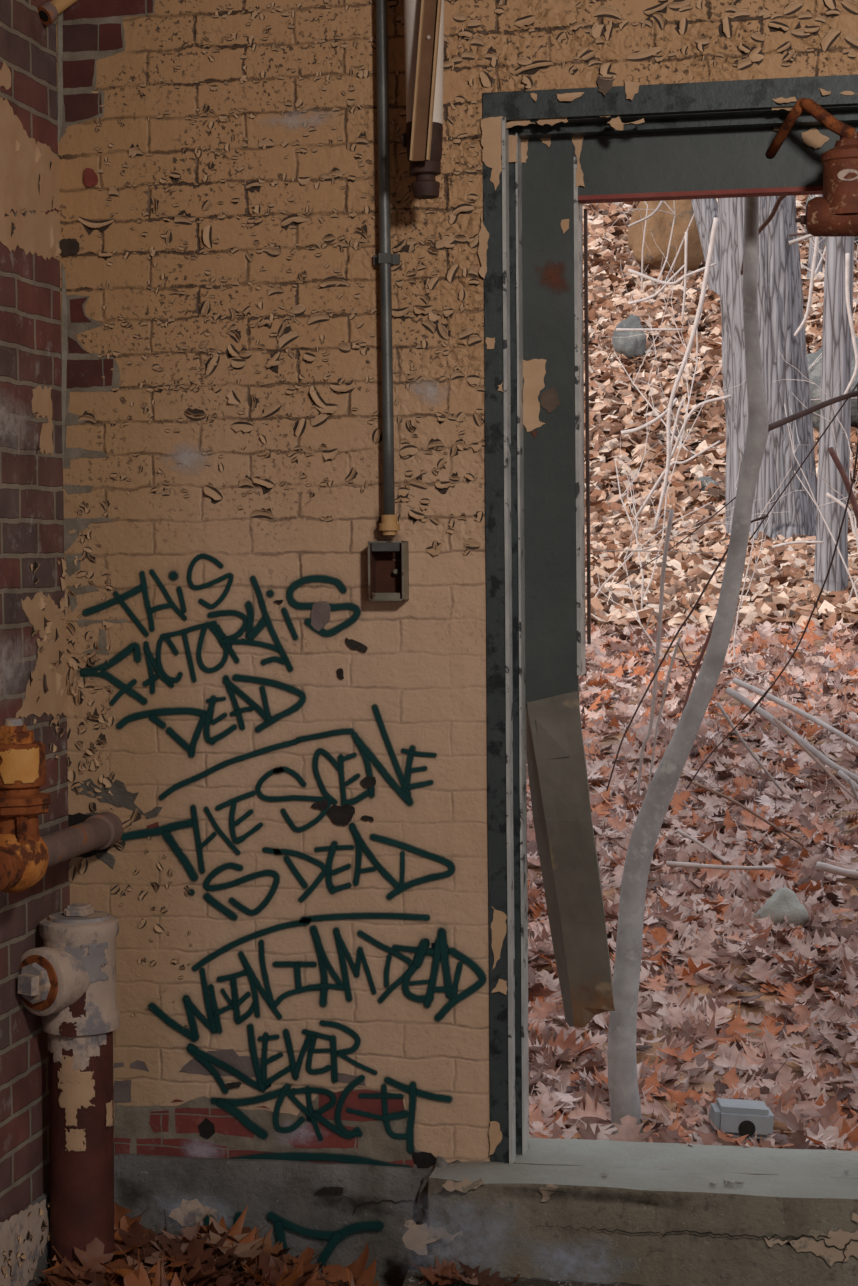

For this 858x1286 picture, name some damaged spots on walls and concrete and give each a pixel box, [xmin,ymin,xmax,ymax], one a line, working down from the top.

peeling [0,0,858,942]
peeling [491,907,508,995]
peeling [179,1049,262,1089]
flaking render [114,1060,432,1169]
peeling [488,1121,502,1155]
peeling [442,1177,484,1193]
peeling [0,1200,50,1286]
peeling [402,1219,463,1255]
crack [525,1224,858,1264]
peeling [765,1213,858,1266]